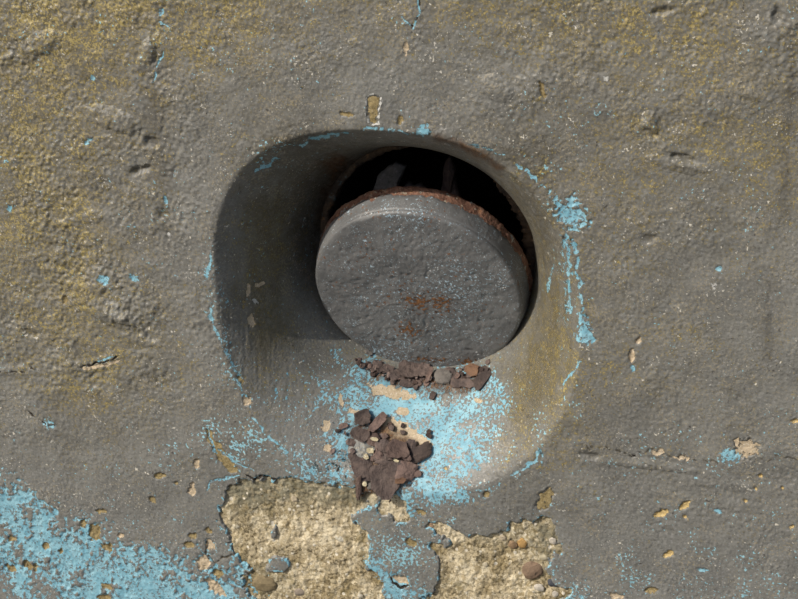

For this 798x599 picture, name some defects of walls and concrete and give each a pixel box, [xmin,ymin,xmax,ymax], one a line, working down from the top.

crack [401,0,421,56]
spalling [365,93,382,126]
rust [319,186,533,304]
rust [387,285,462,340]
crack [81,356,120,371]
rust [365,356,477,392]
rust [357,418,407,442]
spalling [720,437,760,467]
spalling [0,344,583,599]
rust [354,475,373,501]